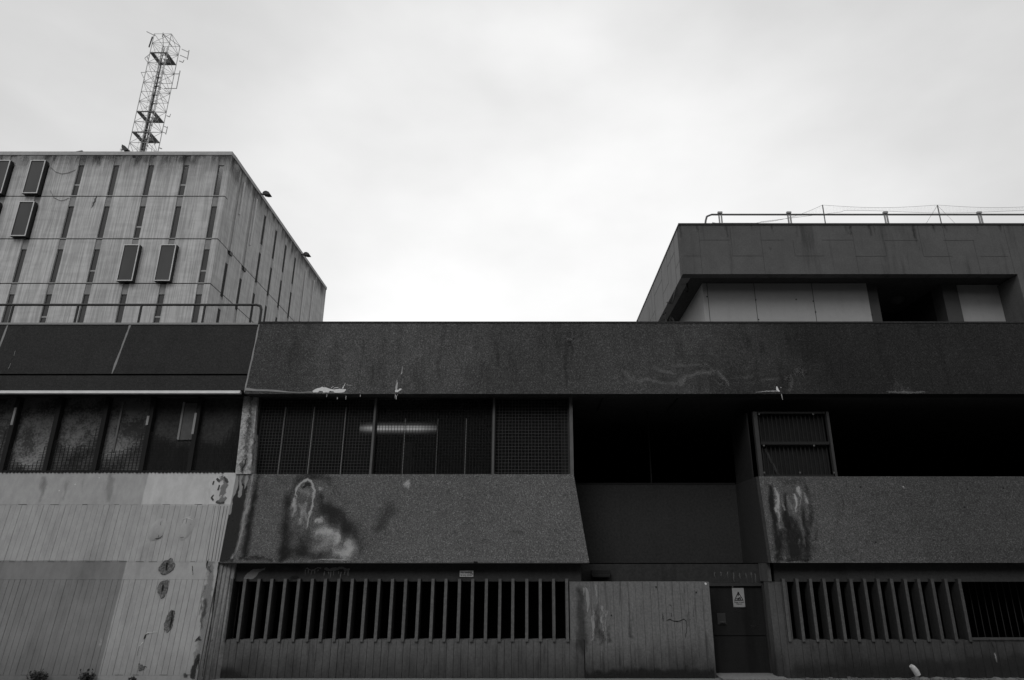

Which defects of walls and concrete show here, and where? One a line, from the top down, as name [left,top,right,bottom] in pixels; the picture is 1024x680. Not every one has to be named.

peeling [211,396,256,515]
leakage [279,474,356,560]
leakage [769,486,812,562]
spalling [157,558,175,599]
spalling [164,610,175,632]